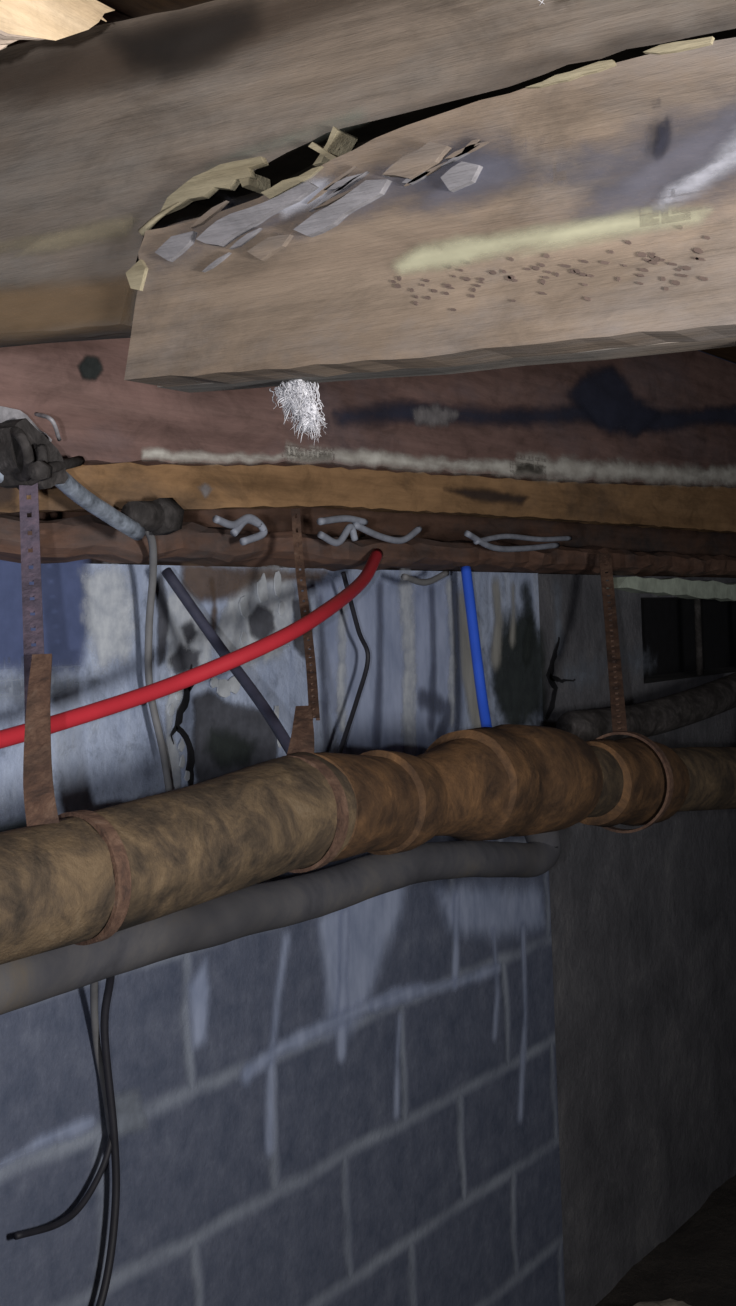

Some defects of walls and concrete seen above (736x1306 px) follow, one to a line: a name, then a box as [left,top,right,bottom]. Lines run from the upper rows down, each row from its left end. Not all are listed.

crack [351,139,372,151]
crack [195,164,316,218]